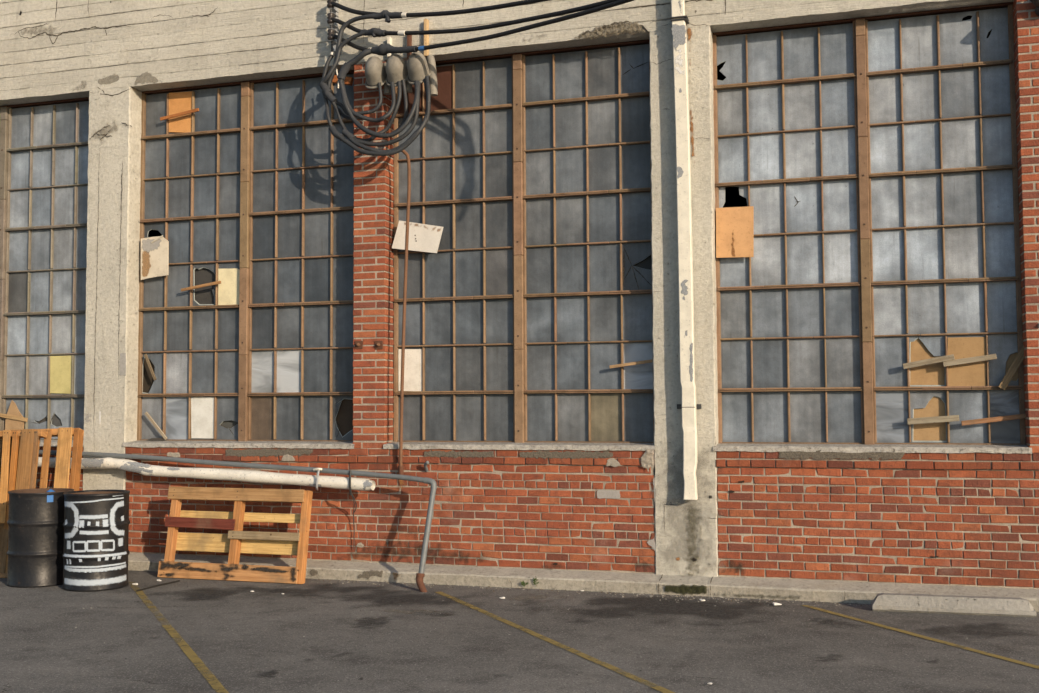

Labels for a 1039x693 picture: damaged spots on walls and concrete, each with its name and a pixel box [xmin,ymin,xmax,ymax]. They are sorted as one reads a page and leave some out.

crack [14,0,217,44]
spalling [575,21,645,39]
peeling [98,74,119,84]